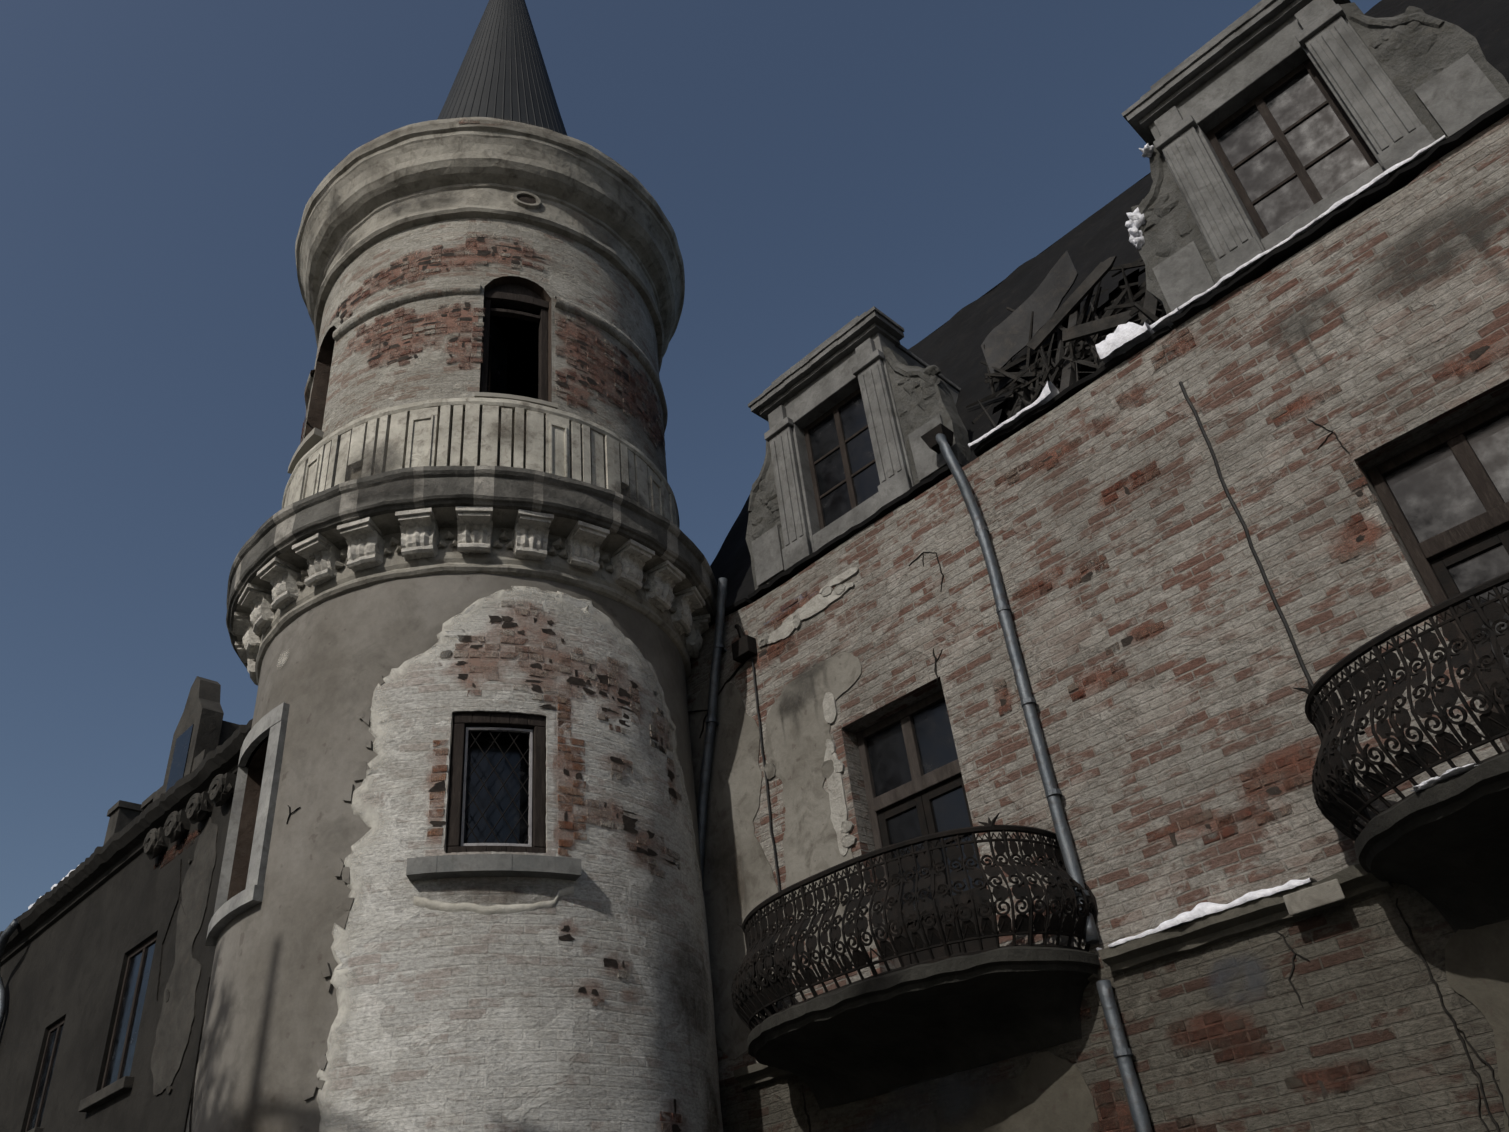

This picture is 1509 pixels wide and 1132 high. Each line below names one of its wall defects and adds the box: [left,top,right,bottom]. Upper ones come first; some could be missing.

spalling [331,233,546,368]
spalling [555,315,666,454]
flaking render [751,567,859,671]
flaking render [301,586,862,1132]
crack [1396,898,1509,1132]